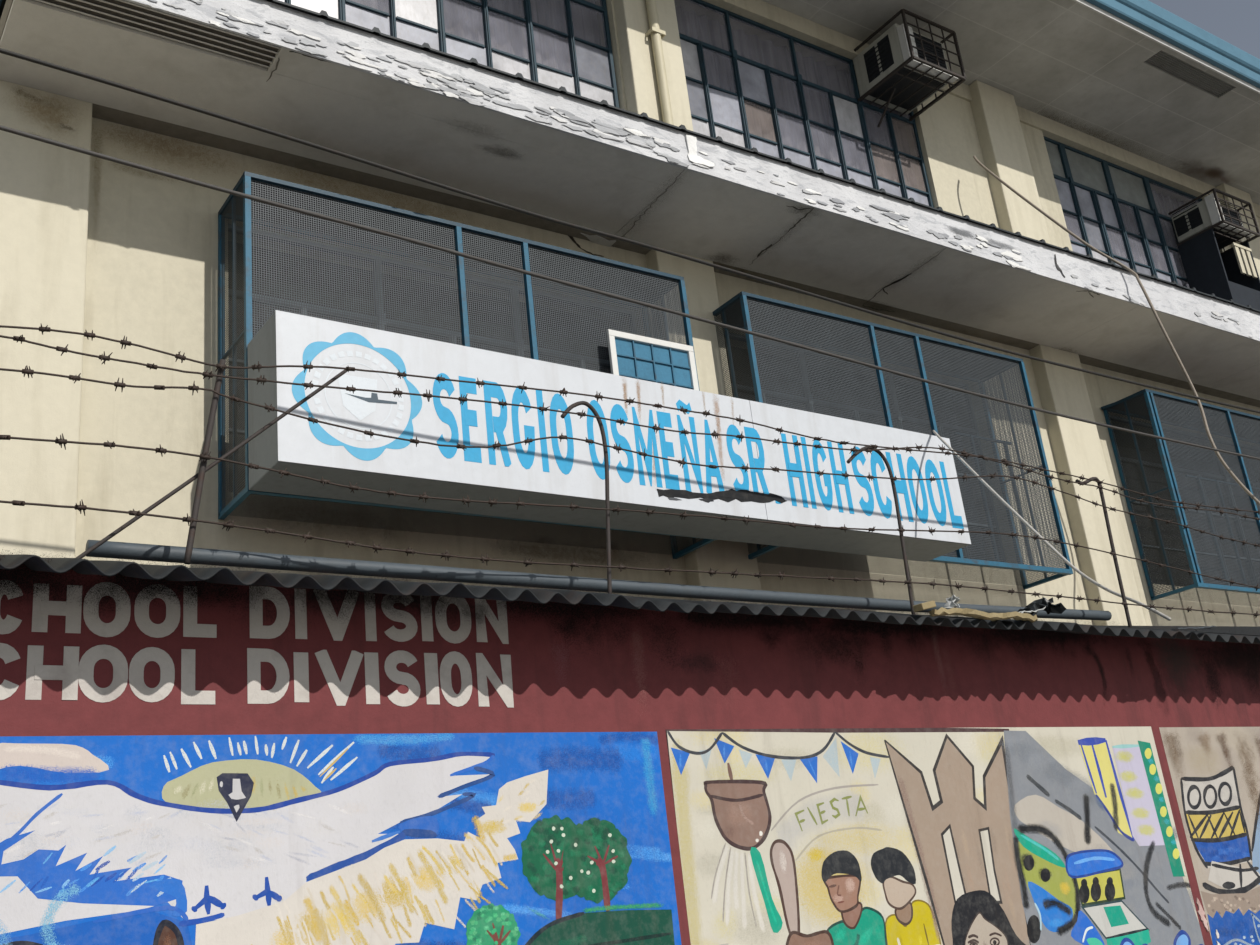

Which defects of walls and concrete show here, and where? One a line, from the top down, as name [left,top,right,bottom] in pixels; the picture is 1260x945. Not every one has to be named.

peeling [147,0,203,10]
peeling [209,7,910,231]
crack [569,161,697,257]
crack [752,205,825,266]
peeling [927,226,1031,271]
crack [860,248,952,313]
peeling [1071,274,1146,306]